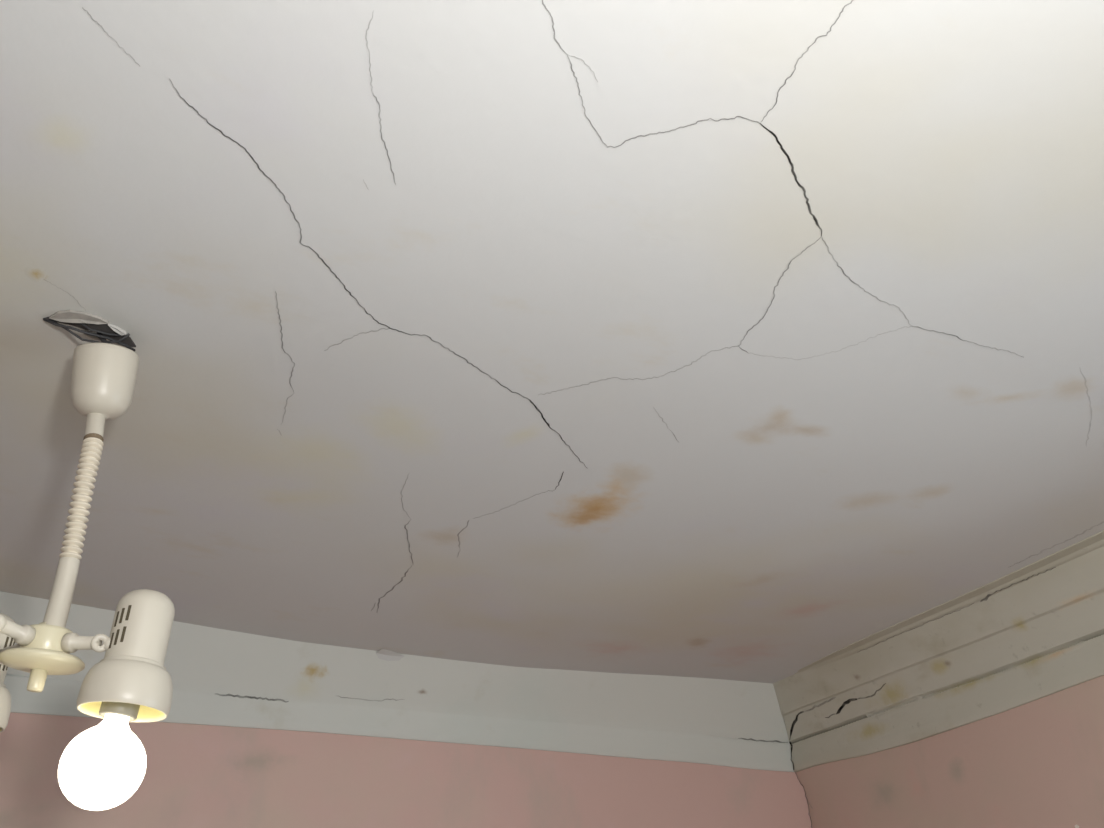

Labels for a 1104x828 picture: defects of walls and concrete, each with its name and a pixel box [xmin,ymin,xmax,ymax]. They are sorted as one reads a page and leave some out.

crack [557,41,645,147]
crack [684,67,822,240]
crack [175,88,587,490]
crack [738,258,794,352]
water stain [723,402,841,450]
crack [738,683,886,786]